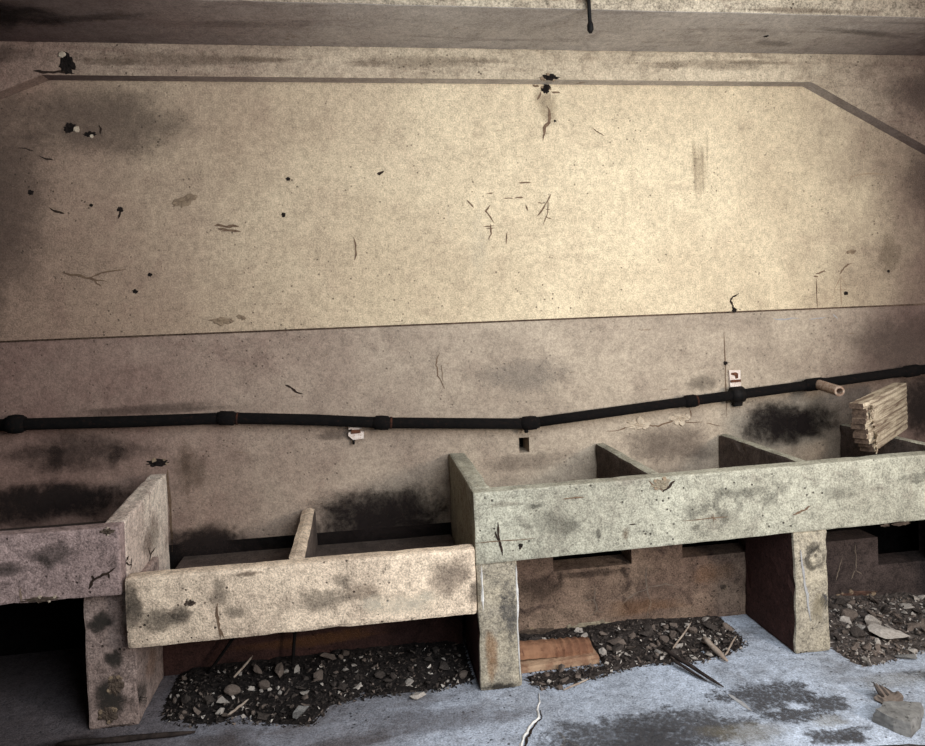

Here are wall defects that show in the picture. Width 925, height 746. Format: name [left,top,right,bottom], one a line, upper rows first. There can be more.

crack [519,694,580,746]
damp [537,681,871,746]
crack [879,738,925,746]